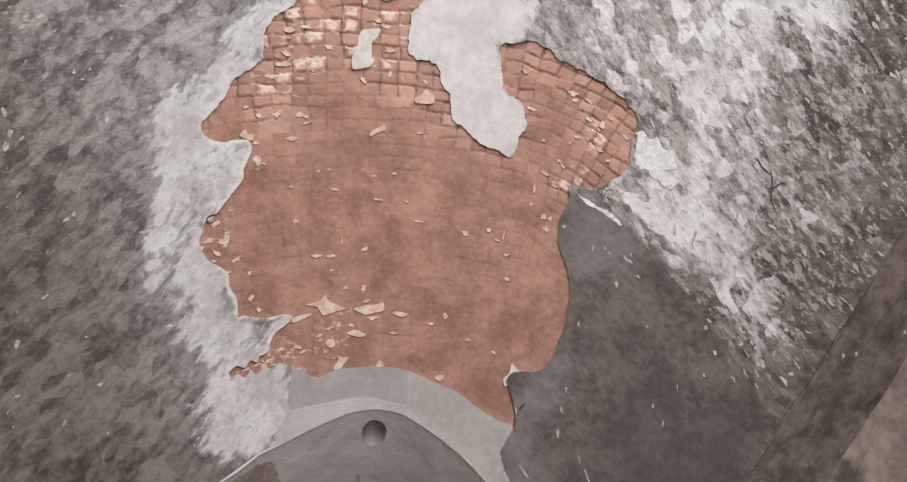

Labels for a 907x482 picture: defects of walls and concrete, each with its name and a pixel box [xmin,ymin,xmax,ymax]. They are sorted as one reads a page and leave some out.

peeling [0,0,73,198]
flaking render [93,0,678,482]
water stain [496,0,907,482]